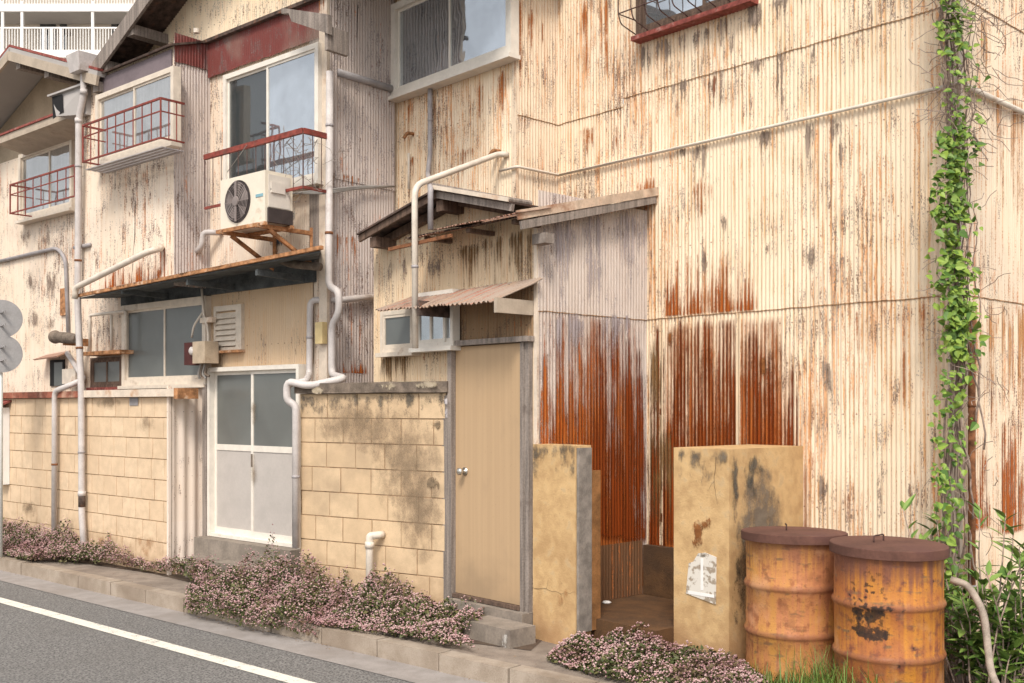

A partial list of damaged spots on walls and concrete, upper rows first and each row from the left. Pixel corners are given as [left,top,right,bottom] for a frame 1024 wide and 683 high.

damp [389,435,426,533]
damp [533,444,574,473]
corrosion [537,258,802,547]
damp [719,452,779,596]
corrosion [976,305,1024,533]